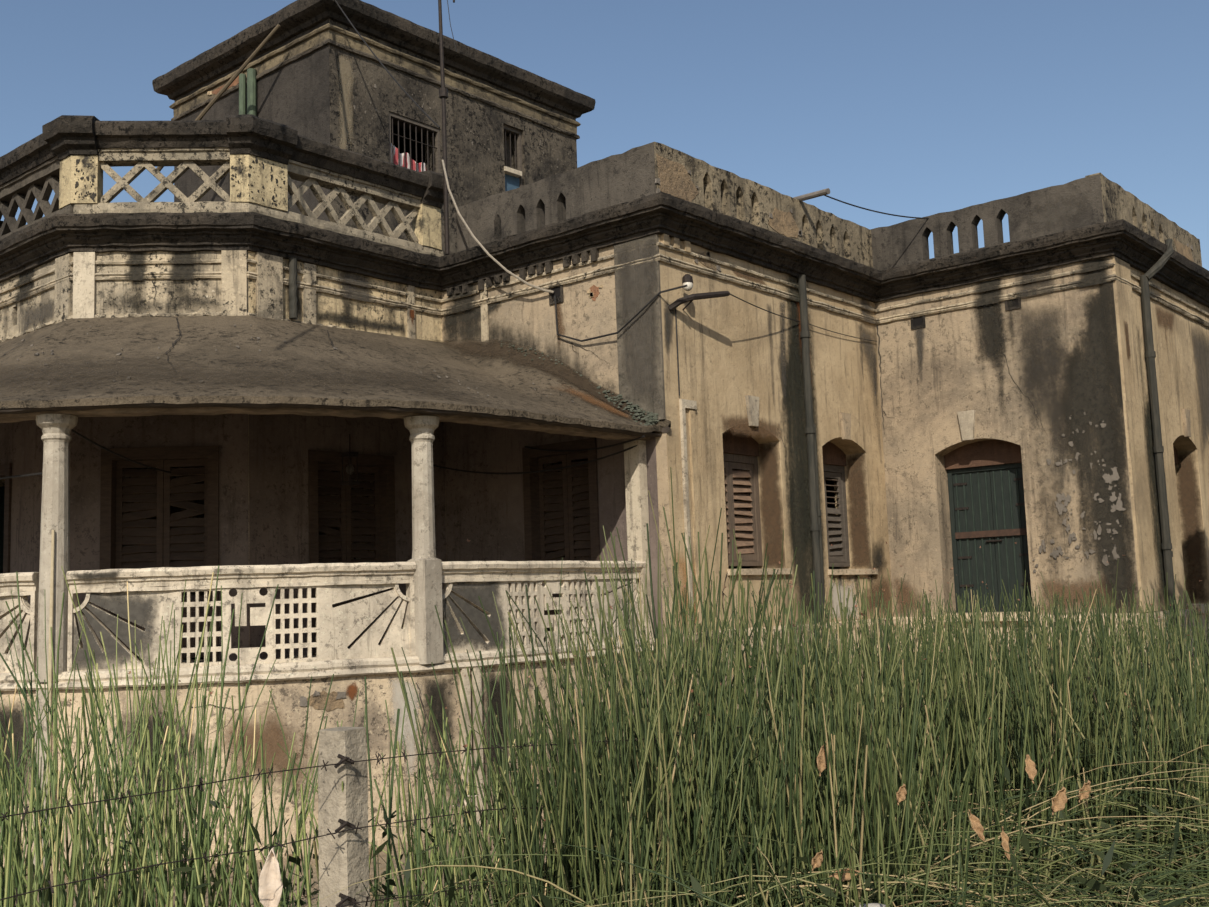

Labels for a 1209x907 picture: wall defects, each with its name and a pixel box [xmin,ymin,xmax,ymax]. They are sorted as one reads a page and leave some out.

water stain [111,252,150,309]
water stain [170,252,205,308]
water stain [975,257,1133,611]
water stain [1193,333,1209,444]
peeling [1032,412,1126,572]
water stain [1177,454,1207,602]
water stain [73,572,155,670]
spalling [300,690,346,712]